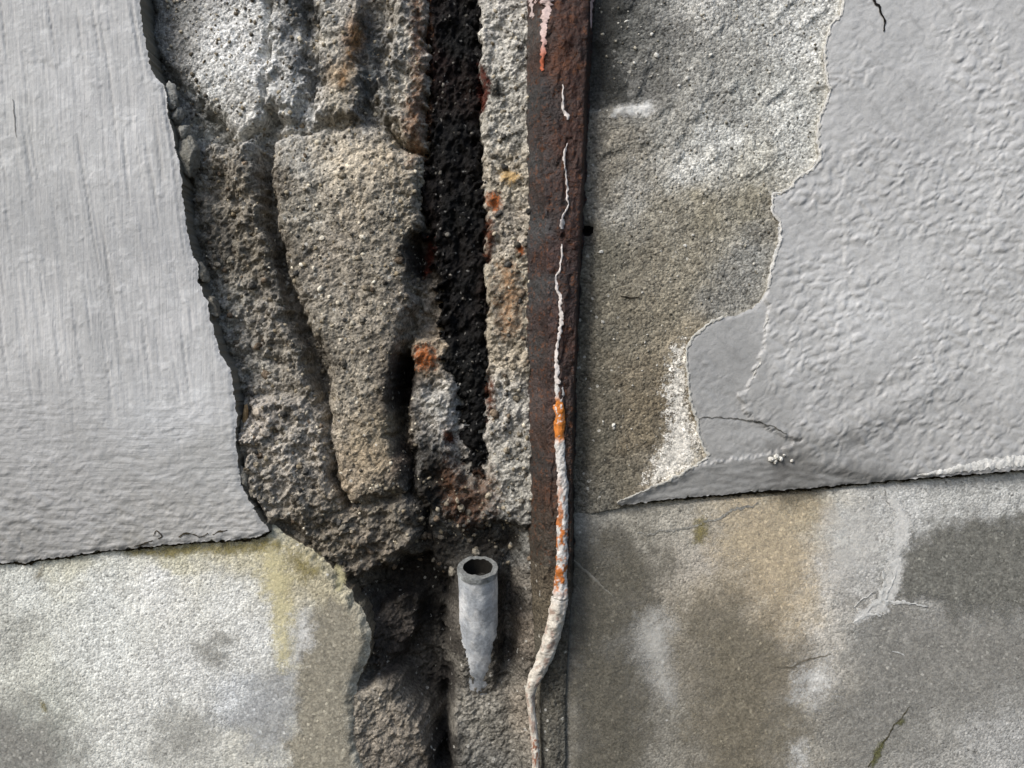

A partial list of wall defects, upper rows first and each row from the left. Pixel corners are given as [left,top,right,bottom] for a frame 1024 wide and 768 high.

crack [873,0,886,31]
spalling [152,0,554,768]
corrosion [409,0,500,483]
peeling [554,244,564,384]
peeling [559,143,569,229]
leakage [641,337,701,486]
peeling [573,0,846,516]
crack [694,417,787,434]
leakage [229,597,365,768]
leakage [567,535,675,768]
crack [637,455,1024,623]
leakage [842,493,1024,751]